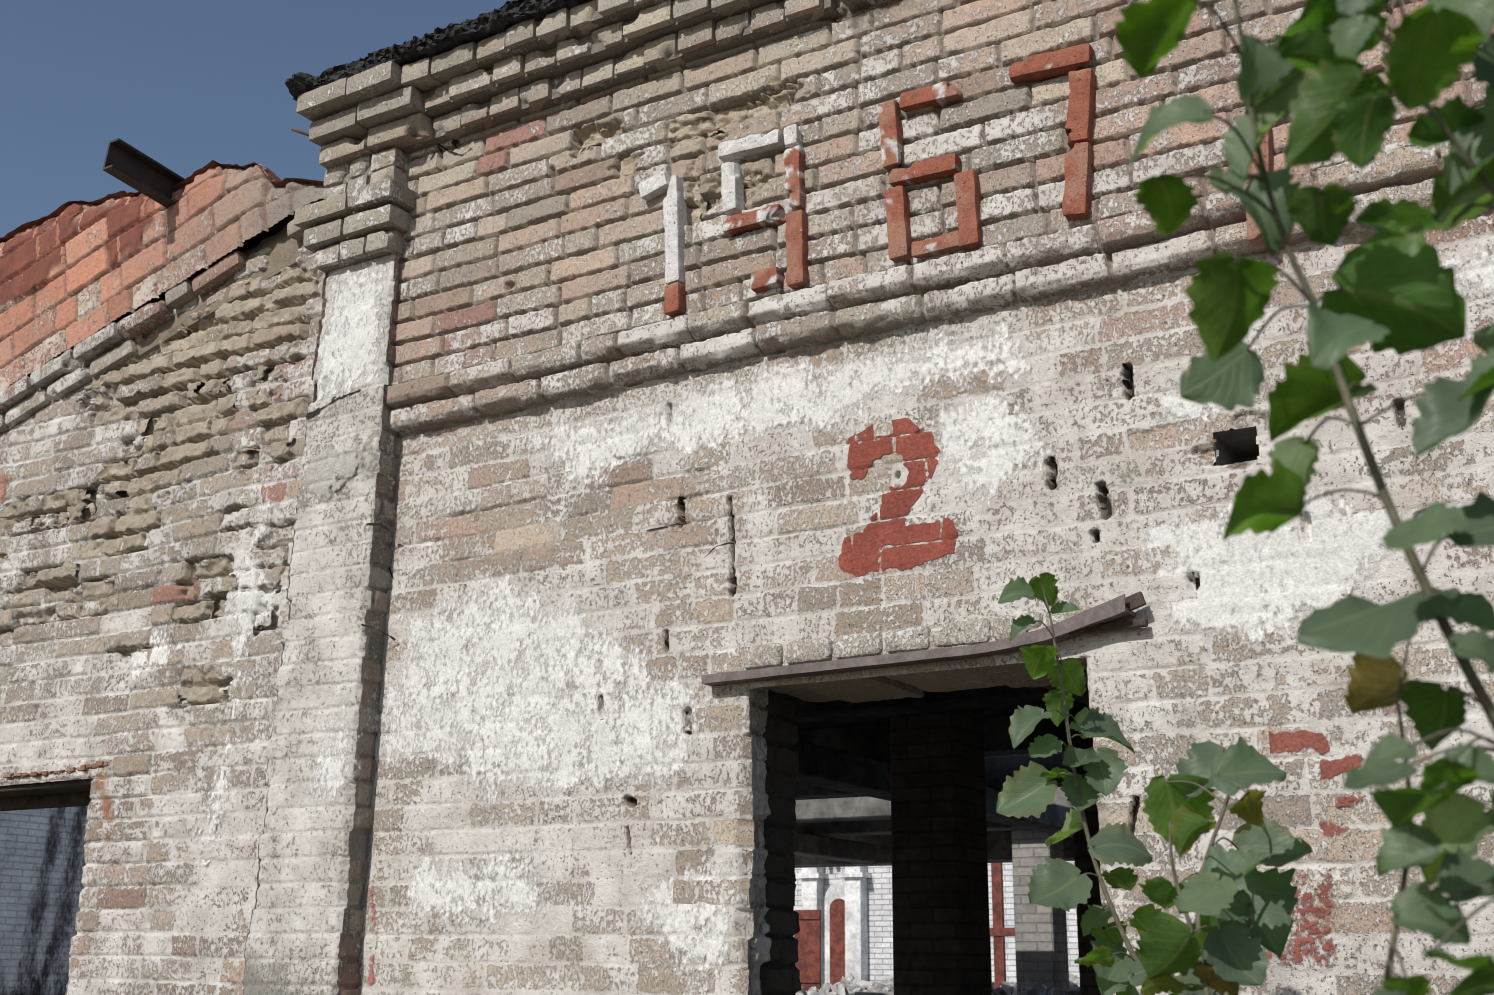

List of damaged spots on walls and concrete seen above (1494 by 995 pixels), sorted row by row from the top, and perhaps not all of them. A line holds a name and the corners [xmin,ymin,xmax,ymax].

spalling [0,256,390,557]
spalling [26,562,118,617]
crack [646,497,686,531]
crack [704,500,737,591]
peeling [129,497,288,866]
peeling [304,697,360,806]
peeling [1261,729,1362,780]
peeling [1319,791,1362,837]
peeling [1266,872,1337,966]